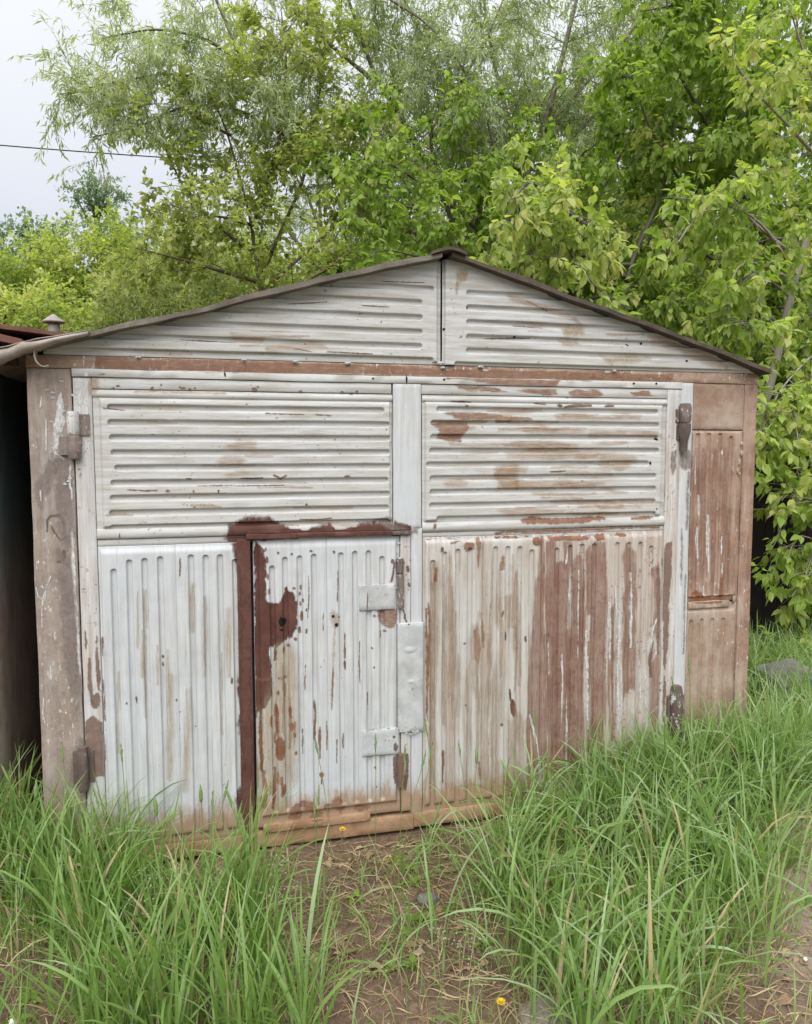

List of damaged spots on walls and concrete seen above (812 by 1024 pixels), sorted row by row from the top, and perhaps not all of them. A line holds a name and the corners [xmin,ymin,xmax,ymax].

corrosion [95,356,673,397]
corrosion [432,410,643,474]
corrosion [495,466,662,535]
corrosion [691,575,723,604]
corrosion [258,575,344,809]
peeling [371,605,410,649]
corrosion [425,604,456,717]
corrosion [509,689,529,720]
corrosion [543,552,614,789]
corrosion [648,542,672,721]
peeling [366,728,419,791]
corrosion [288,798,369,822]